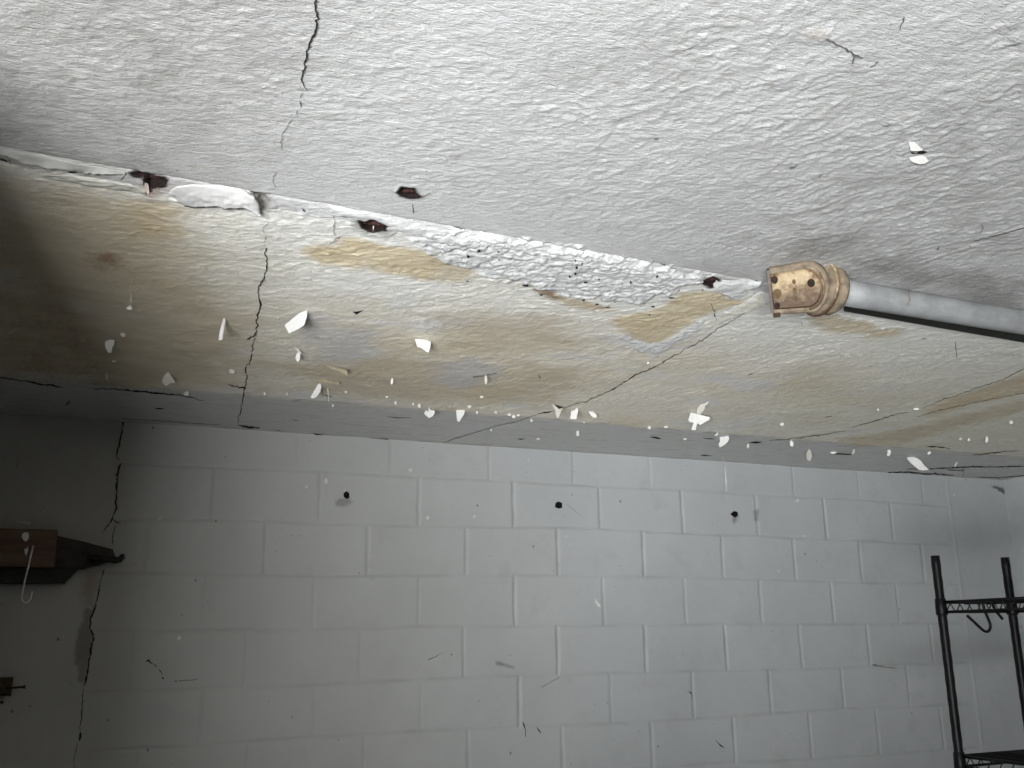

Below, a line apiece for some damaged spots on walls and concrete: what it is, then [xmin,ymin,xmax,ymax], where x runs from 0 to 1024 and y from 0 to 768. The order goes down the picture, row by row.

crack [280,0,319,150]
leakage [0,138,752,414]
crack [95,223,279,543]
peeling [285,311,307,333]
peeling [415,339,431,352]
peeling [552,404,597,436]
crack [443,304,744,443]
peeling [684,401,710,440]
leakage [721,345,892,411]
peeling [907,451,931,470]
leakage [827,369,1024,449]
crack [73,570,104,762]